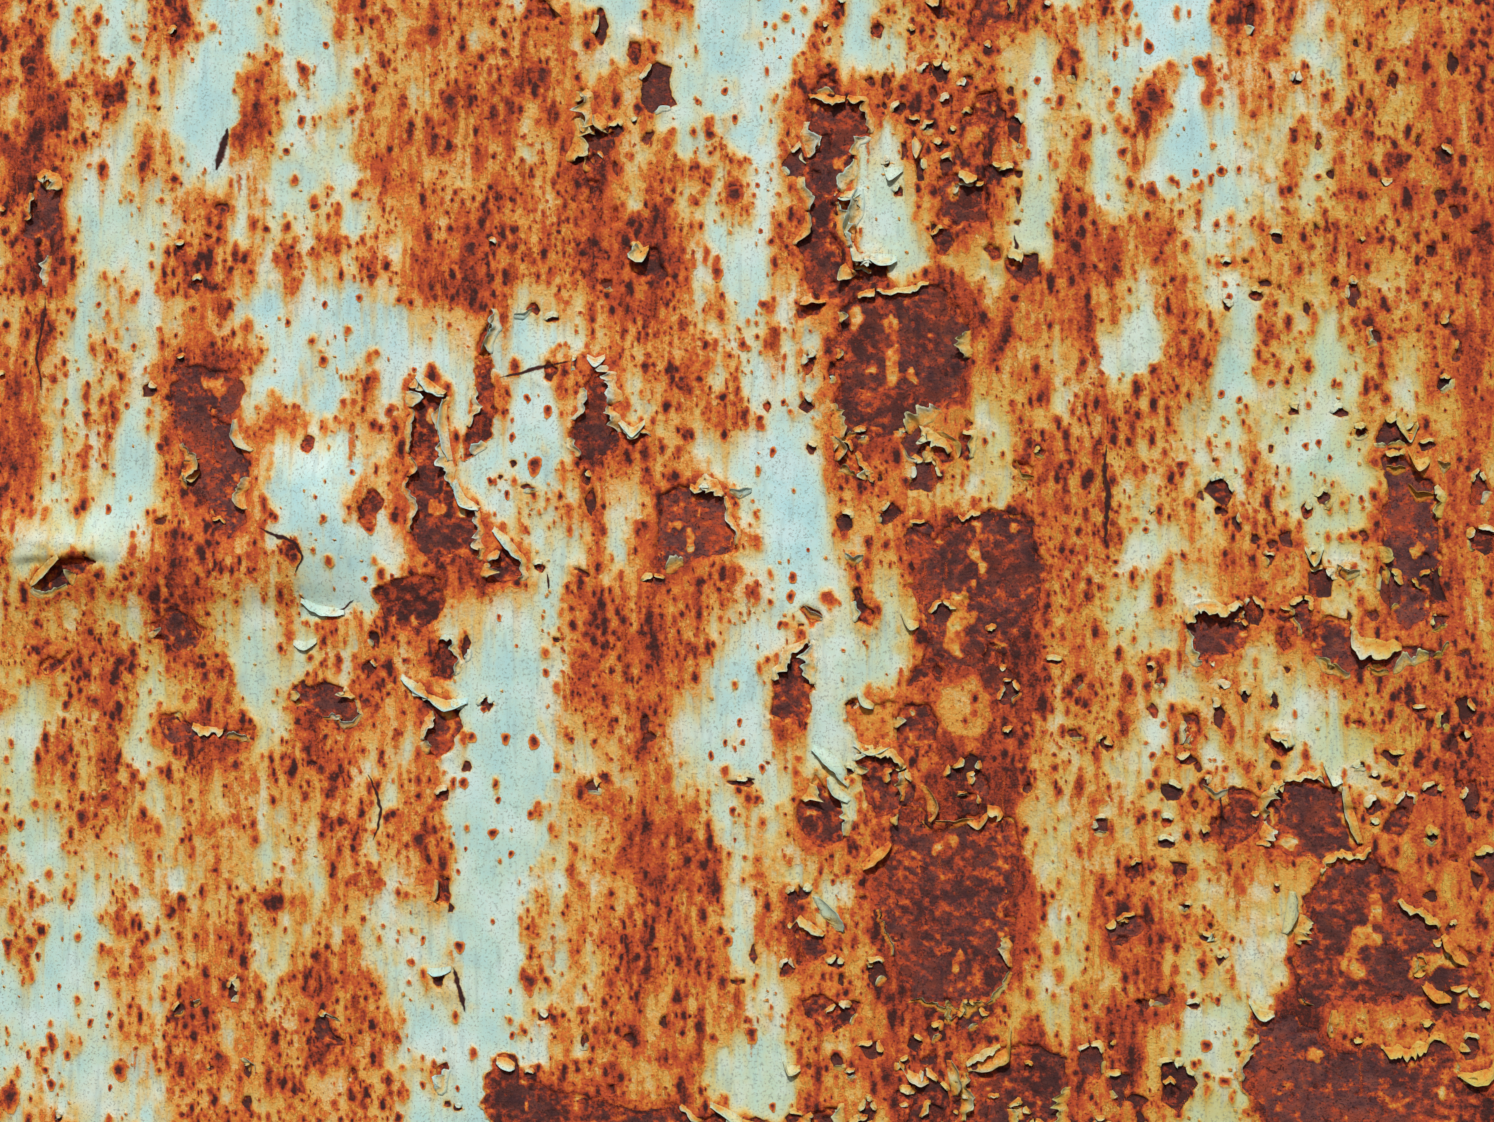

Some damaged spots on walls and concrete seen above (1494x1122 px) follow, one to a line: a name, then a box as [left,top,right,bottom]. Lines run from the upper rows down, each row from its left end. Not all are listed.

peeling [781,59,1024,492]
peeling [983,243,1039,282]
peeling [143,353,254,538]
peeling [364,303,559,757]
peeling [544,354,651,516]
peeling [640,473,752,585]
peeling [771,605,822,727]
peeling [875,501,1047,705]
corrosion [740,0,1494,1122]
peeling [779,883,860,1033]
peeling [781,688,1201,1122]
peeling [481,1053,765,1122]